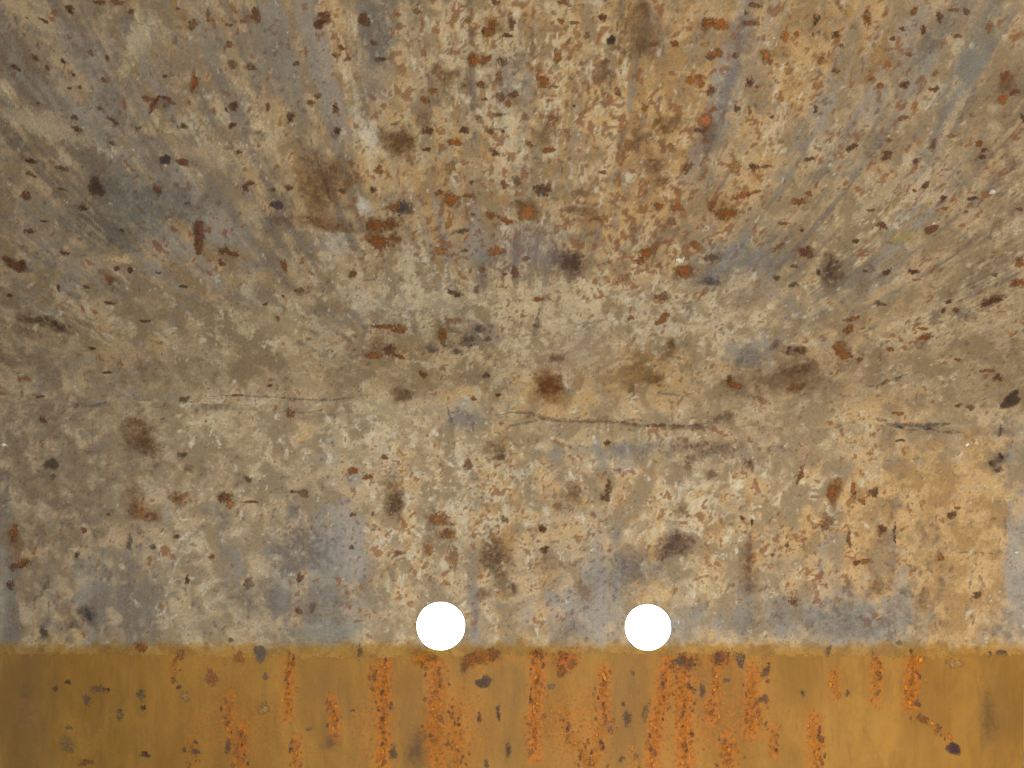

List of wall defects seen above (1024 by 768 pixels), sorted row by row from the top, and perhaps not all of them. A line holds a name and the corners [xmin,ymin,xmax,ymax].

rust [463,0,516,38]
rust [699,18,738,61]
rust [446,115,505,146]
rust [446,53,519,117]
rust [641,74,717,144]
rust [366,200,415,251]
rust [471,176,553,224]
rust [981,257,1024,308]
rust [653,291,670,326]
rust [826,477,879,505]
rust [429,512,459,569]
rust [524,648,782,768]